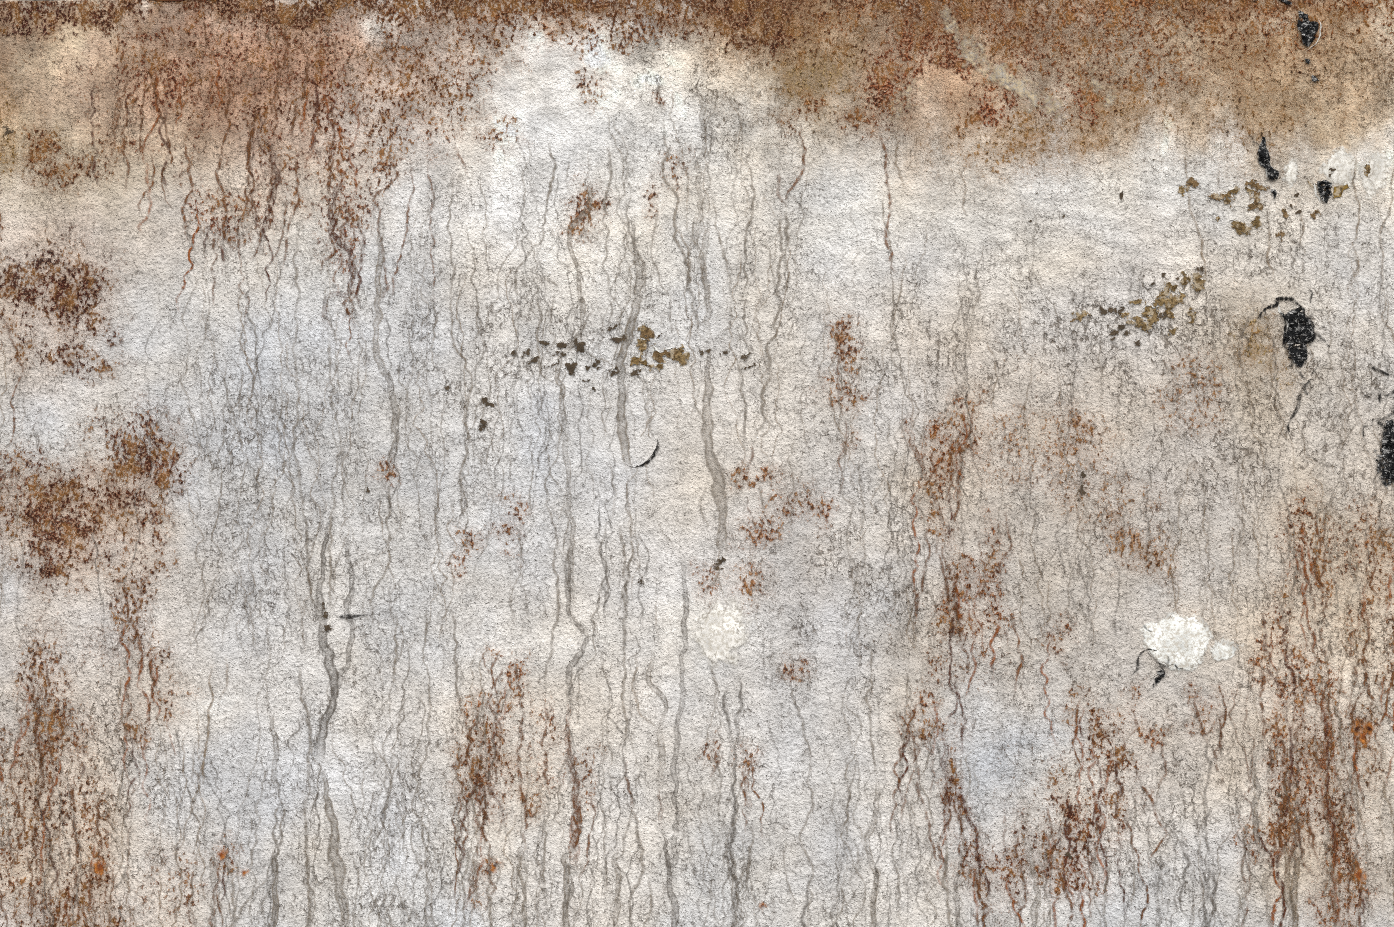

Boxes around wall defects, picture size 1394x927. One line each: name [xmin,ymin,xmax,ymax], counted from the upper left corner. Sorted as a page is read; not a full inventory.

rust [0,214,123,386]
leakage [373,163,433,540]
leakage [536,135,660,460]
rust [0,0,1394,346]
leakage [946,21,1386,179]
rust [0,404,191,927]
rust [142,833,248,927]
leakage [270,521,357,923]
leakage [541,646,681,927]
rust [891,390,1177,927]
leakage [1174,622,1349,927]
rust [1233,487,1394,927]